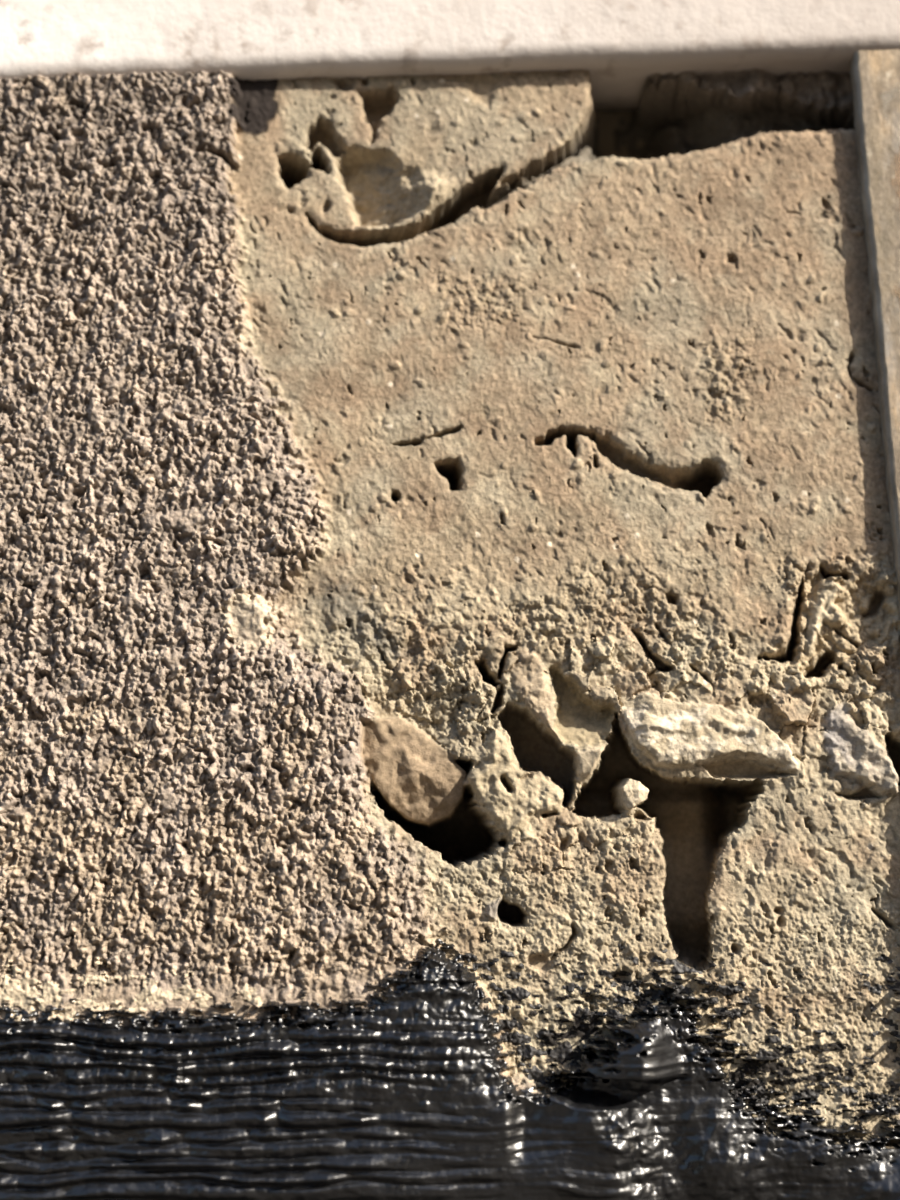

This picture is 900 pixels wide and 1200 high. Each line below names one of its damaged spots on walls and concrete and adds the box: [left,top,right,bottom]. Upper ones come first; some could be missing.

spalling [479,79,853,209]
spalling [334,144,460,238]
crack [305,167,505,247]
crack [535,427,725,498]
spalling [757,565,895,681]
spalling [458,759,474,772]
spalling [885,733,900,786]
spalling [370,788,511,868]
spalling [497,666,798,971]
peeling [485,898,503,922]